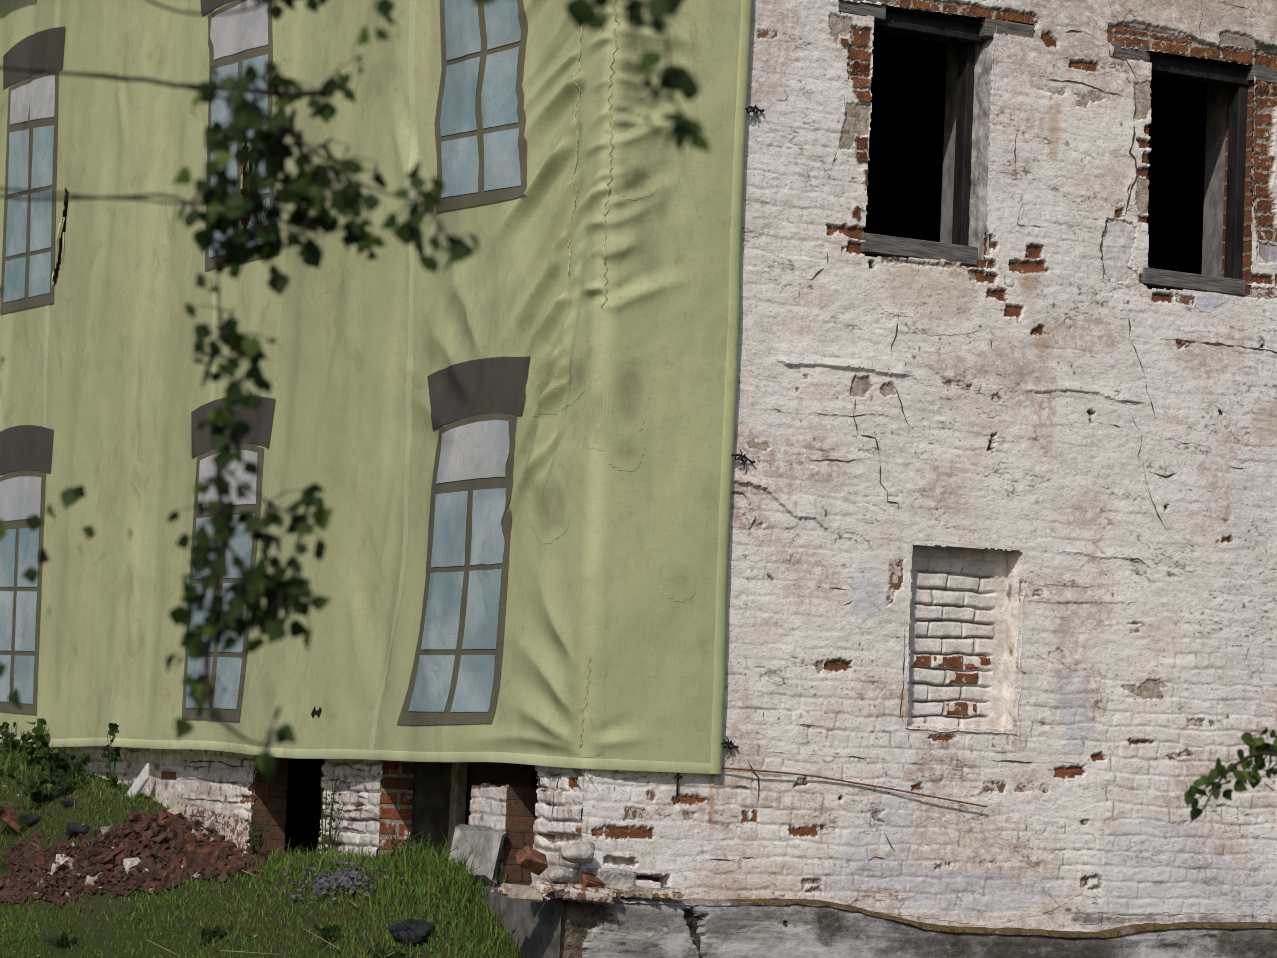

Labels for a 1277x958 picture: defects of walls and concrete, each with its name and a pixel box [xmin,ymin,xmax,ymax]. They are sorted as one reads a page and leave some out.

flaking render [882,0,1056,48]
flaking render [829,14,872,185]
flaking render [1107,23,1277,286]
flaking render [826,206,863,254]
flaking render [962,232,1047,317]
crack [1038,30,1277,533]
crack [808,313,910,508]
flaking render [816,659,850,673]
flaking render [575,825,652,839]
flaking render [789,825,823,836]
water stain [582,788,1277,958]
crack [682,909,703,958]